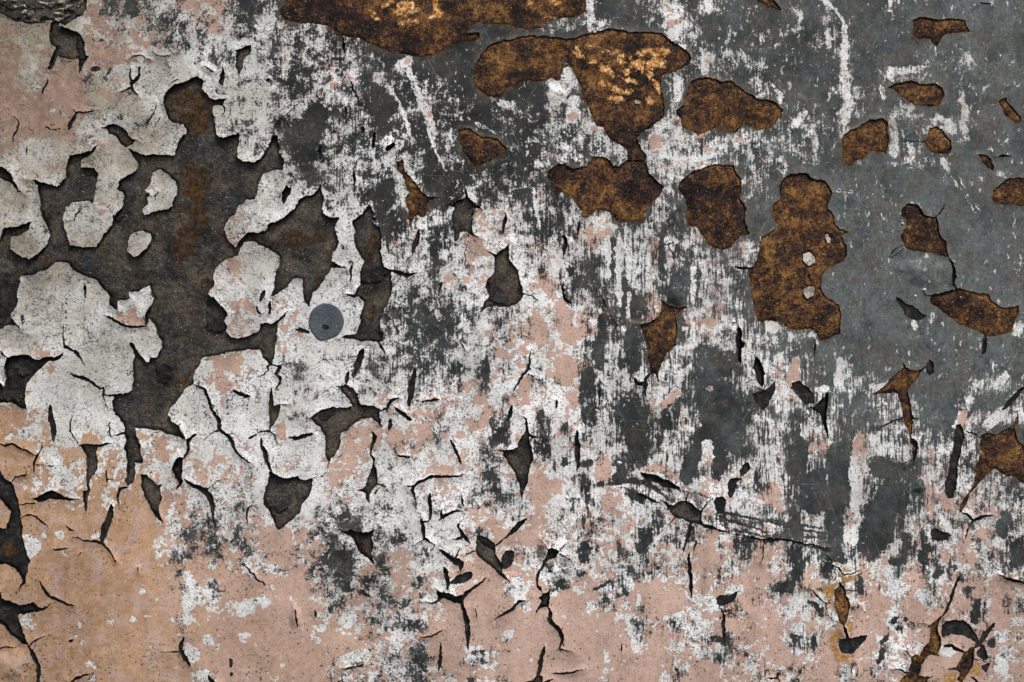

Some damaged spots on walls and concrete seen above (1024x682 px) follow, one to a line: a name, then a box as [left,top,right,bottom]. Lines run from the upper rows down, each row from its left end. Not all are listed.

peeling [0,0,100,73]
corrosion [280,0,783,227]
peeling [0,45,347,530]
peeling [341,205,417,342]
corrosion [635,300,687,381]
corrosion [678,164,848,340]
corrosion [929,288,1019,337]
crack [0,404,139,573]
peeling [307,385,382,503]
crack [374,439,588,678]
crack [573,430,581,472]
crack [636,471,711,598]